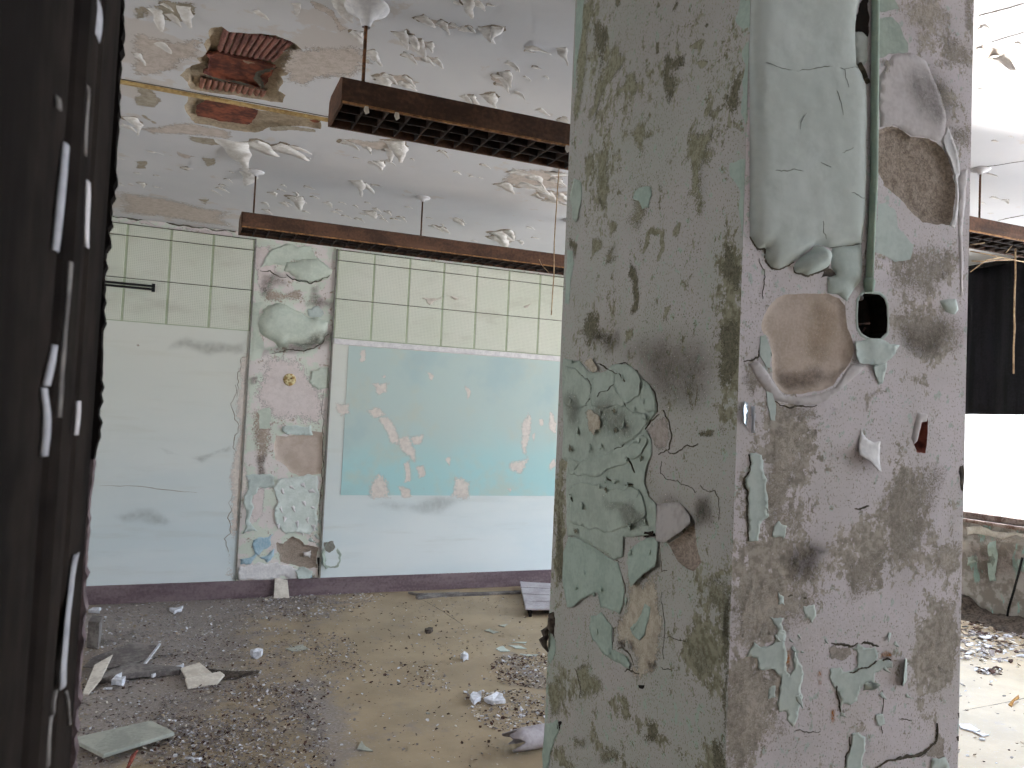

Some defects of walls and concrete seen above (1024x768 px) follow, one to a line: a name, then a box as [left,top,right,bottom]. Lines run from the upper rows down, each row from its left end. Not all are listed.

spalling [46,0,426,768]
crack [581,362,720,520]
peeling [509,311,817,768]
peeling [684,0,1023,539]
peeling [825,639,911,718]
spalling [967,525,1024,581]